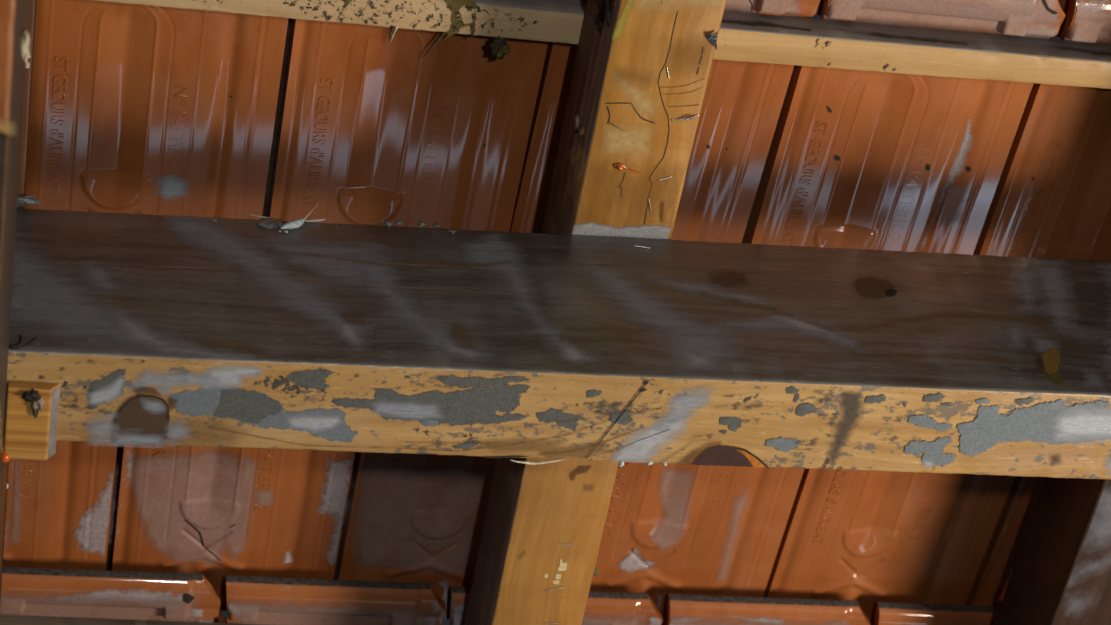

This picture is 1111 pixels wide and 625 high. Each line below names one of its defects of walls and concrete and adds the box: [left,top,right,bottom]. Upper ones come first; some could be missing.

damp [283,0,537,38]
crack [606,0,704,224]
damp [172,216,479,357]
damp [592,268,857,369]
peeling [60,359,707,462]
crack [465,380,692,463]
peeling [701,387,766,437]
peeling [766,437,816,452]
peeling [786,386,835,417]
peeling [886,393,1111,467]
damp [75,453,272,562]
crack [185,520,221,561]